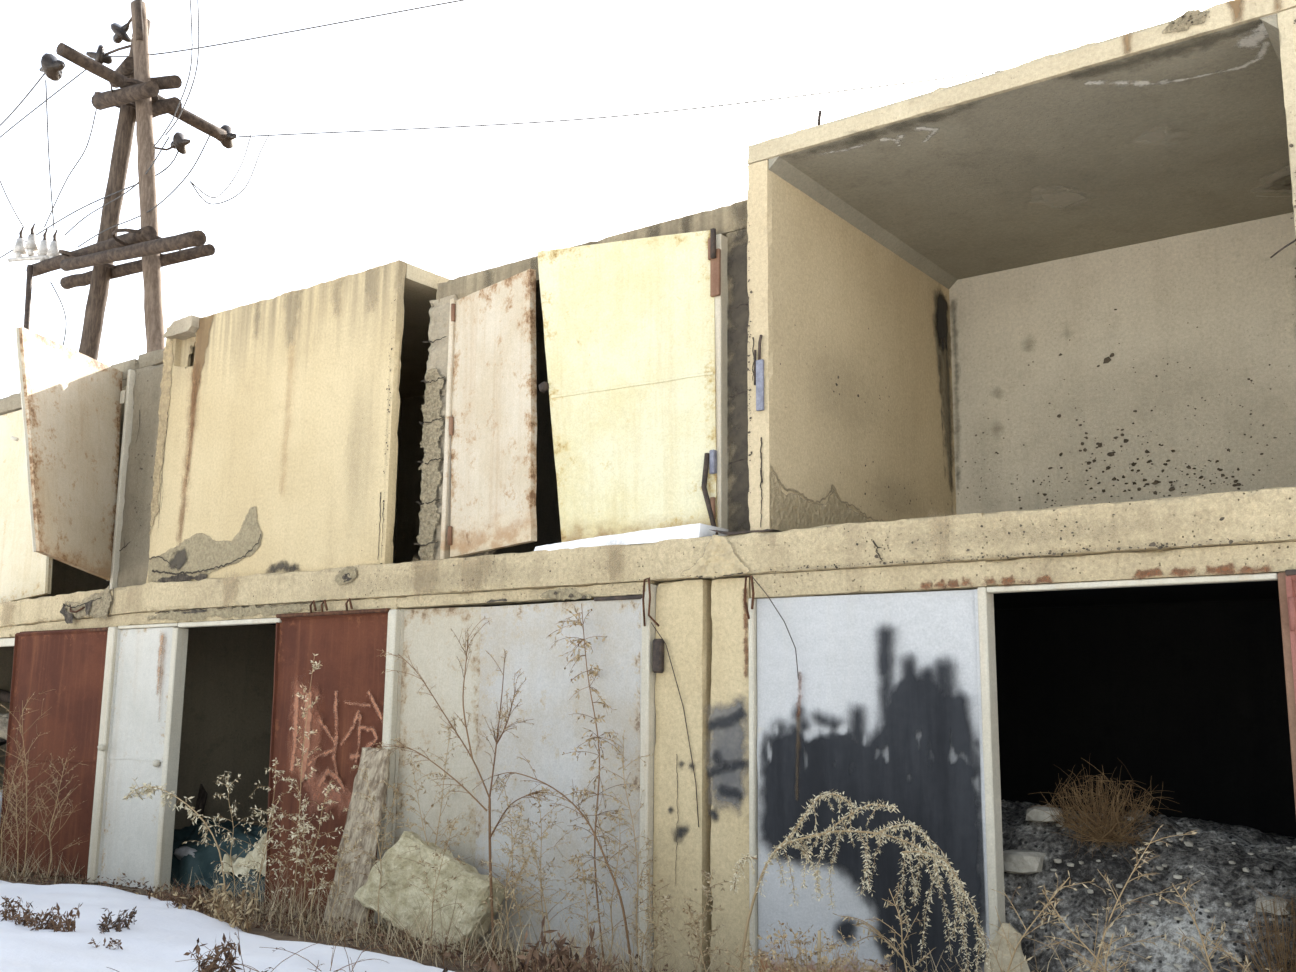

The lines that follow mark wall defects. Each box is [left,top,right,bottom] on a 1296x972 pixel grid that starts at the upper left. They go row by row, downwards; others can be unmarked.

corrosion [1133,563,1270,579]
corrosion [921,575,1052,590]